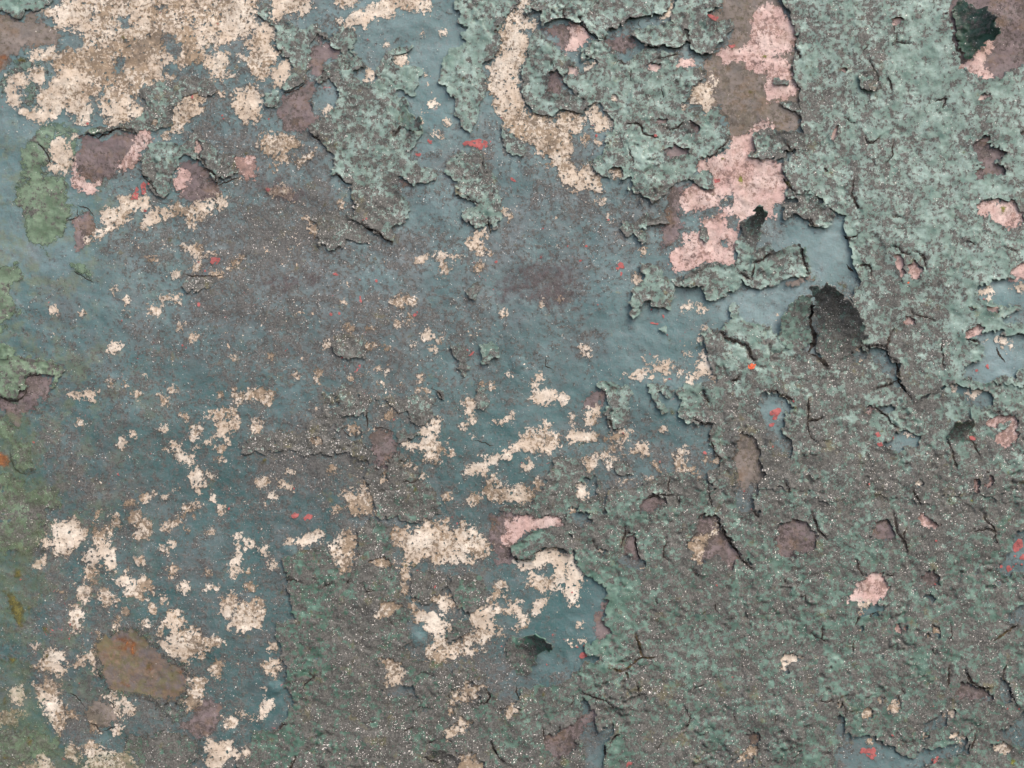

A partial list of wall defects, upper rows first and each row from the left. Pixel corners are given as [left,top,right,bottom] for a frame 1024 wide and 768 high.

peeling [0,0,513,280]
peeling [66,377,142,404]
peeling [389,292,444,354]
peeling [438,0,1024,768]
crack [721,332,755,382]
crack [769,390,823,440]
crack [808,303,829,367]
crack [868,332,911,427]
crack [709,489,753,568]
peeling [123,373,761,768]
peeling [0,472,169,768]
crack [933,625,1018,706]